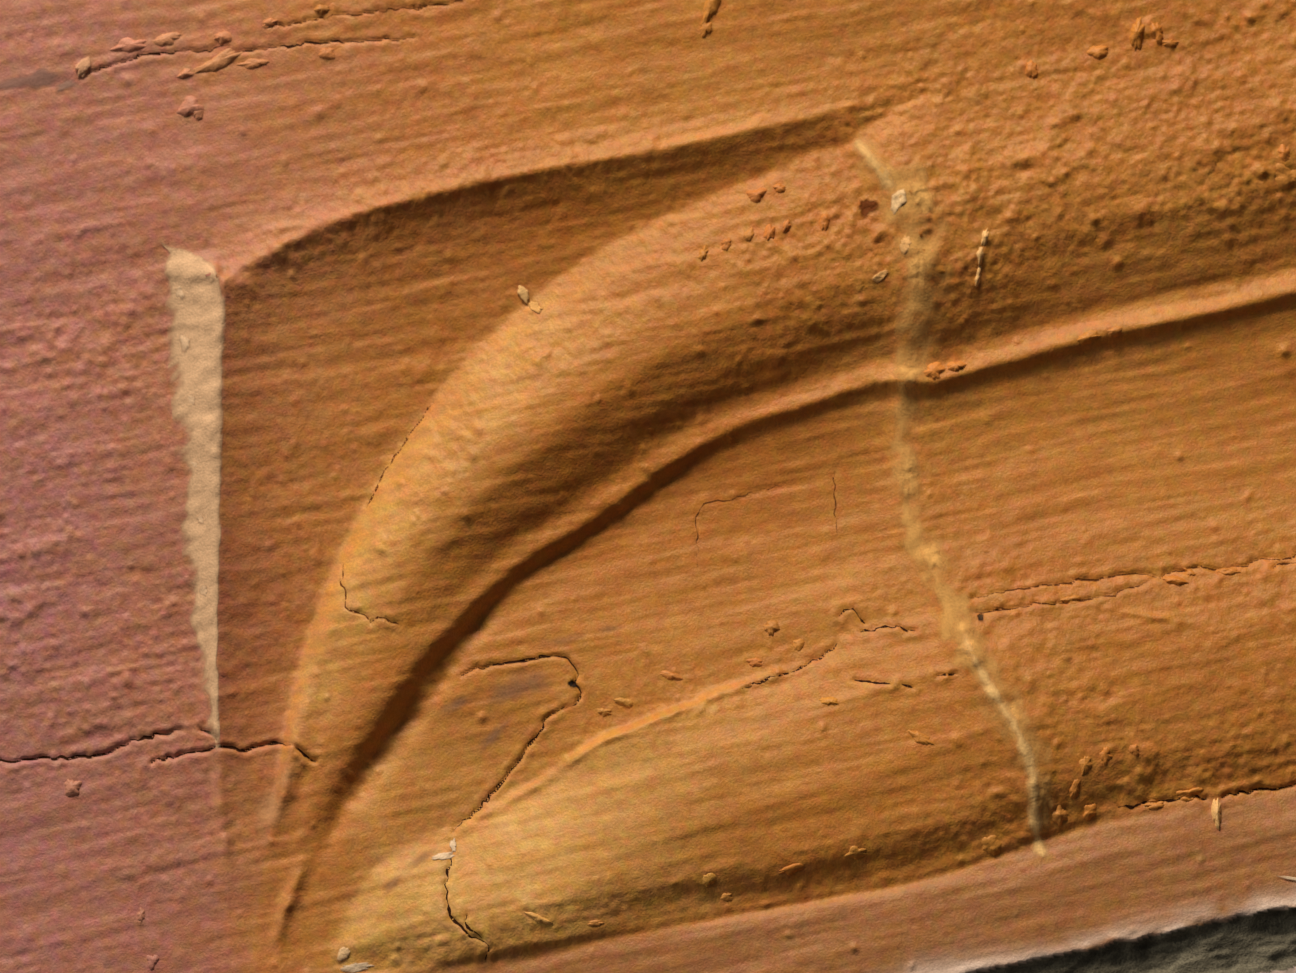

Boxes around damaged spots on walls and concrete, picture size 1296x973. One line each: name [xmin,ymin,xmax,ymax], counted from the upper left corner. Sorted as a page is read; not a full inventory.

crack [95,0,463,72]
crack [975,555,1295,613]
crack [742,608,914,689]
crack [856,673,955,688]
crack [0,729,312,763]
crack [444,654,582,960]
crack [1119,783,1296,809]